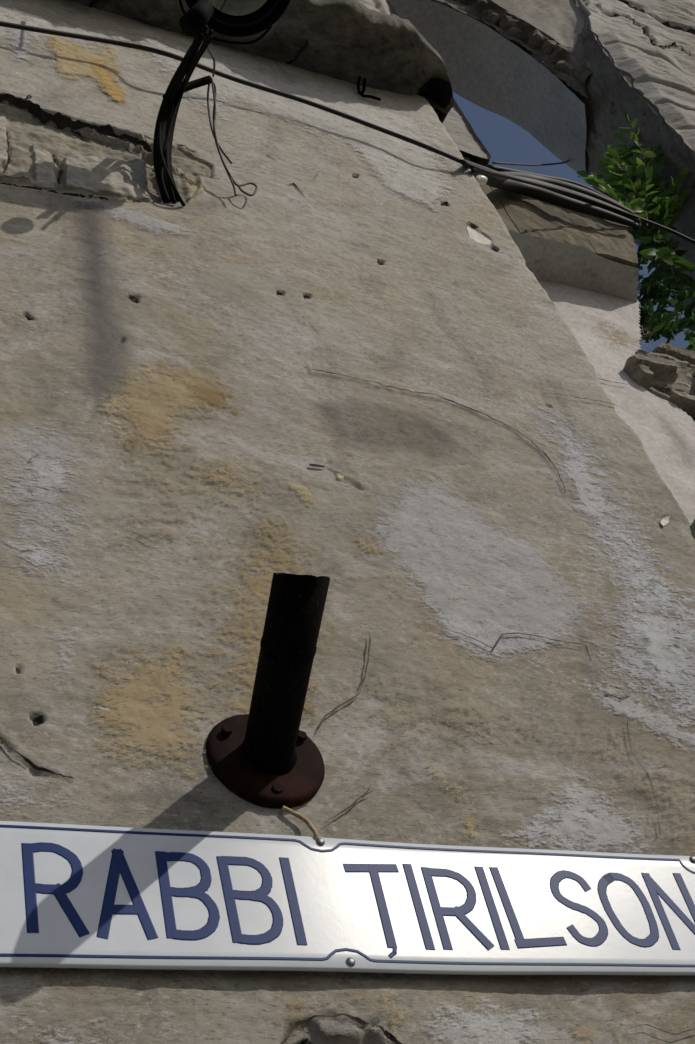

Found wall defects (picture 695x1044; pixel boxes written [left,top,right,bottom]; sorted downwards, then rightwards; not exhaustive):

peeling [0,8,461,212]
spalling [0,111,202,237]
crack [311,369,566,492]
corrosion [195,502,327,751]
corrosion [301,596,332,750]
crack [0,737,73,778]
spalling [287,1019,392,1044]
peeling [423,998,542,1044]